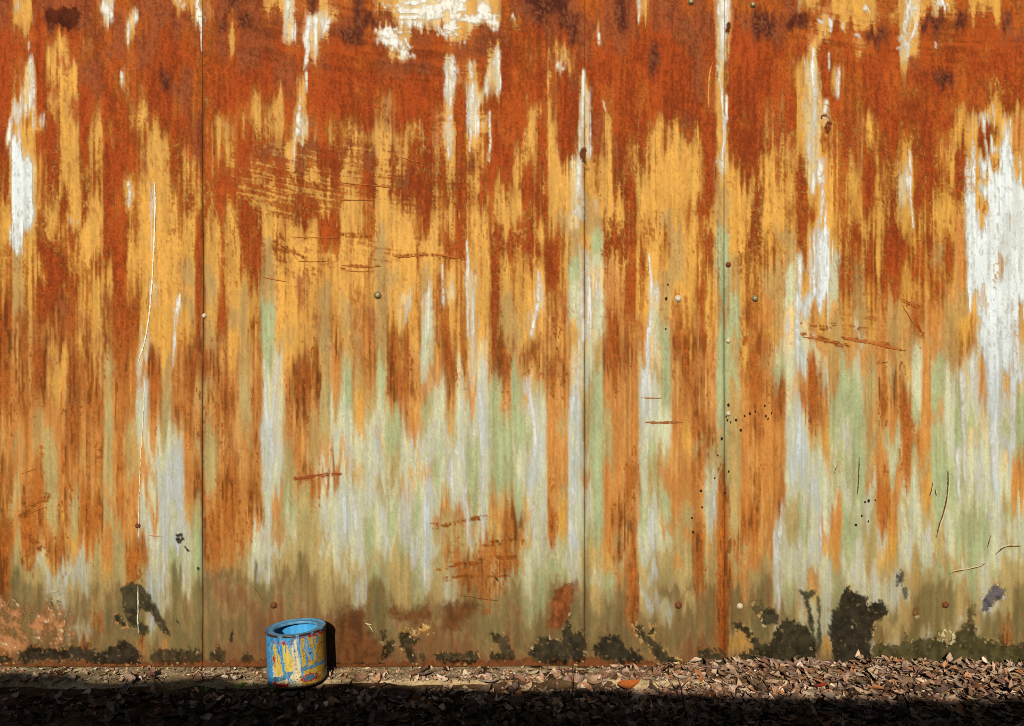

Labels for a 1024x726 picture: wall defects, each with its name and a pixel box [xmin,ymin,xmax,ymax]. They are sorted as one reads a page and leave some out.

peeling [375,0,498,59]
corrosion [0,0,1024,560]
corrosion [0,446,68,597]
corrosion [126,535,155,582]
corrosion [437,502,524,629]
corrosion [548,584,574,629]
corrosion [612,446,639,630]
corrosion [693,463,762,659]